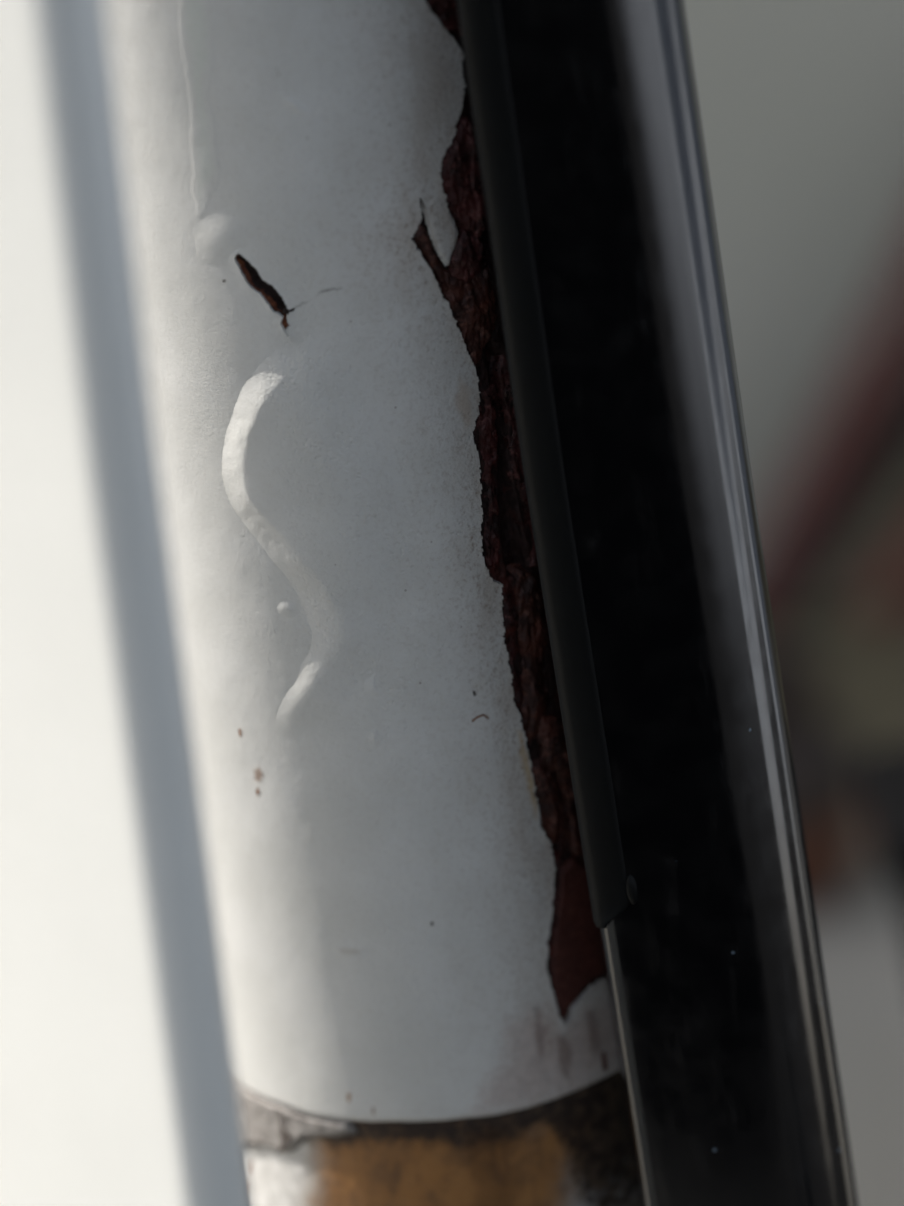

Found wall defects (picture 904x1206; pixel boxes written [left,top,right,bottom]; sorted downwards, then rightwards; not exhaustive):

rust [449,371,478,437]
peeling [411,0,605,1022]
rust [512,724,540,827]
rust [279,1051,628,1206]